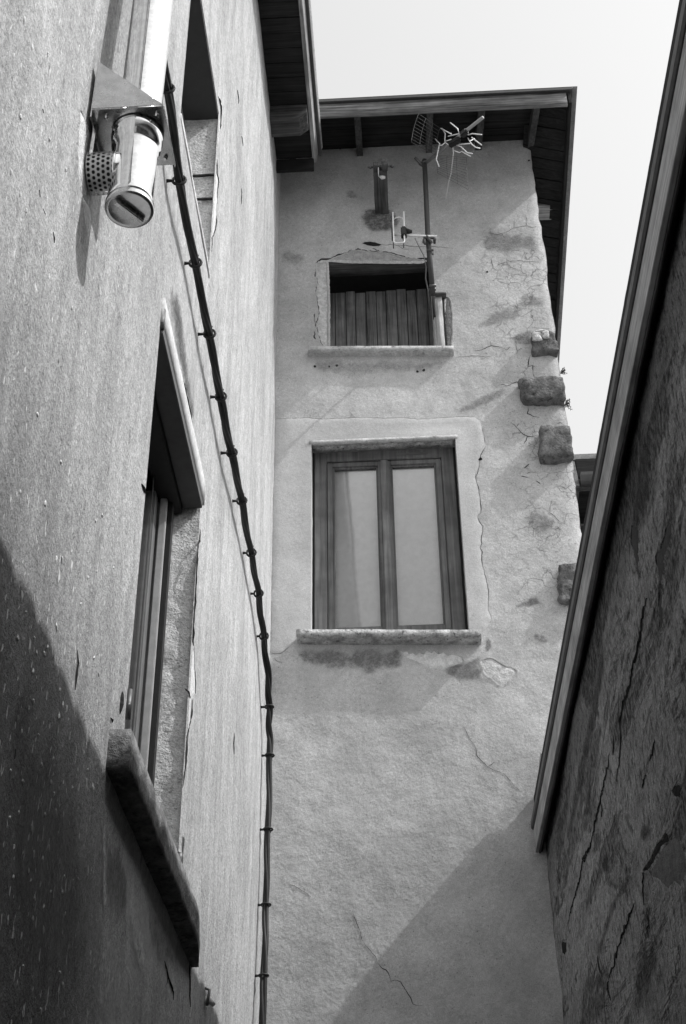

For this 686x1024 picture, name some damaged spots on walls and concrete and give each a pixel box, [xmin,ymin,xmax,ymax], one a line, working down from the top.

leakage [364,210,398,230]
leakage [300,650,399,670]
flaking render [479,657,519,688]
crack [568,597,648,930]
crack [353,914,415,1005]
crack [597,868,649,1001]